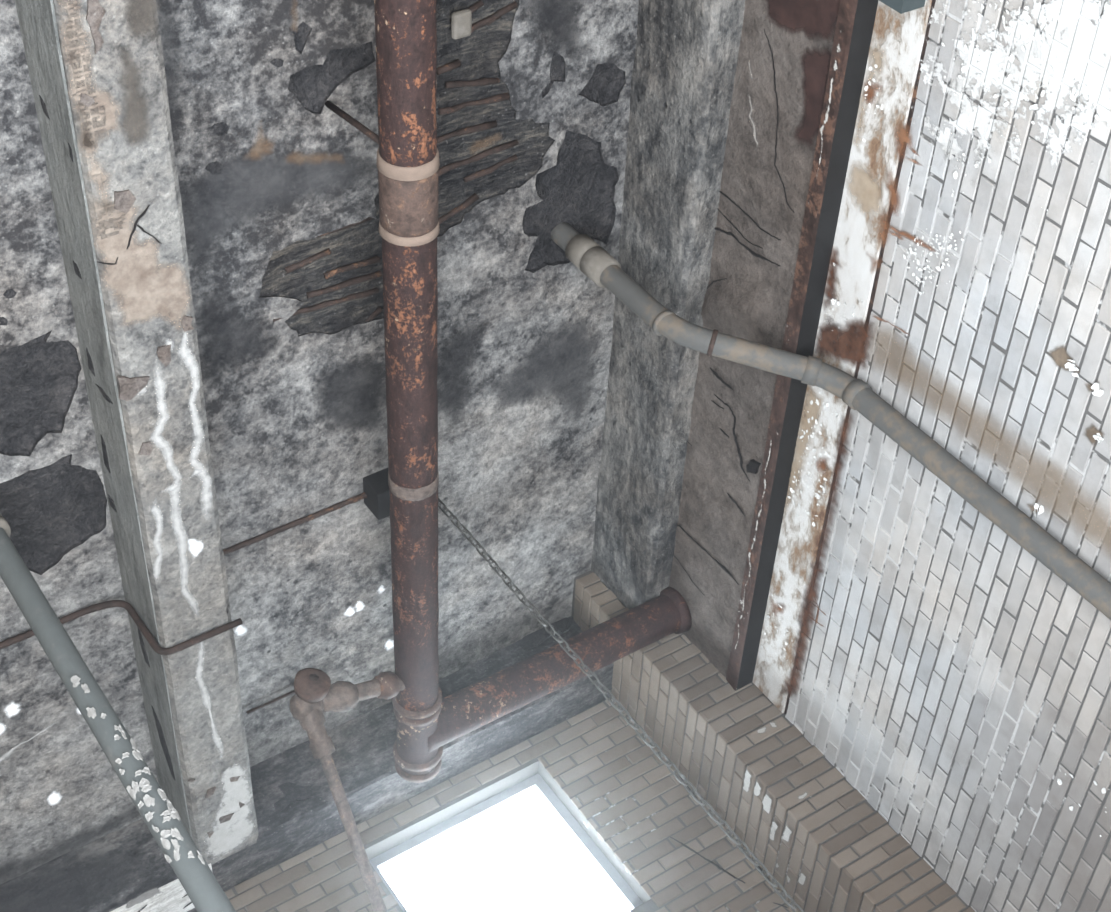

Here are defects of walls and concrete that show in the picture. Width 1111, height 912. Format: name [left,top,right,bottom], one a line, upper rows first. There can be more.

spalling [436,0,626,273]
rust [767,0,840,146]
rust [896,125,919,164]
peeling [911,0,1111,197]
crack [97,205,162,265]
crack [715,191,781,267]
rust [849,167,933,250]
spalling [0,330,81,456]
spalling [0,454,107,575]
water stain [139,332,211,612]
crack [710,368,750,516]
rust [816,316,909,368]